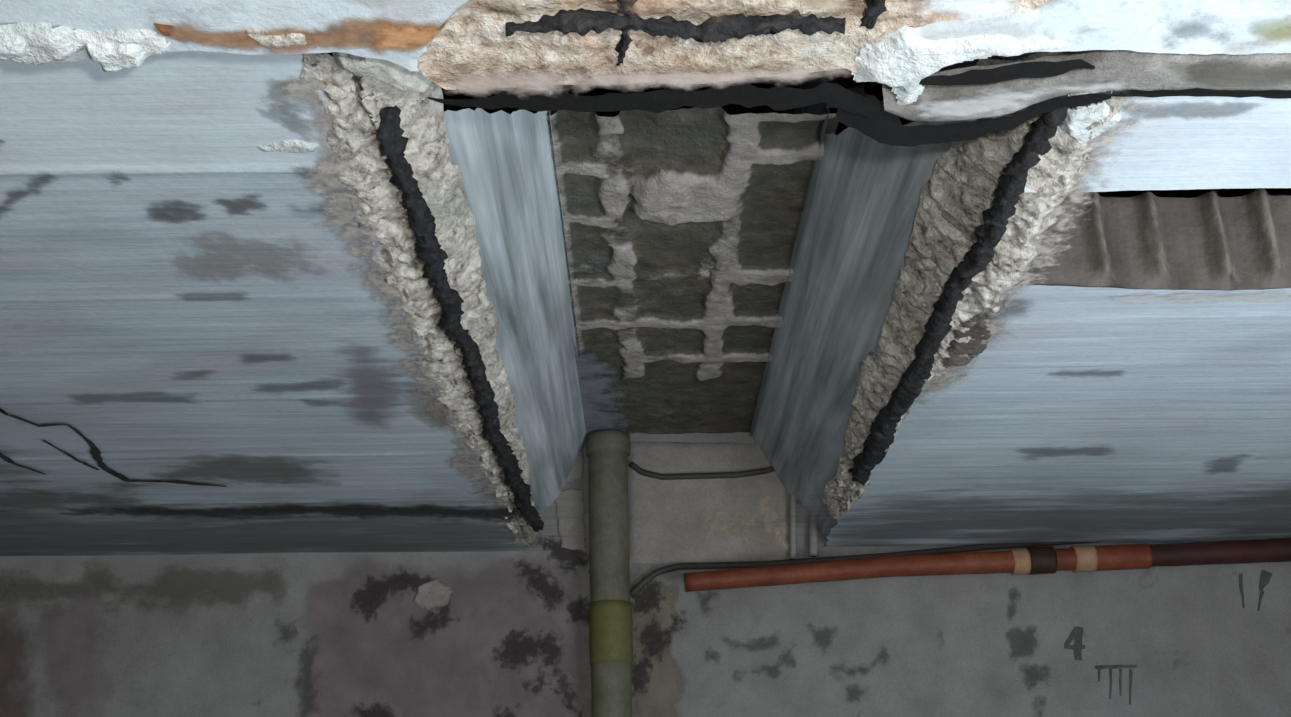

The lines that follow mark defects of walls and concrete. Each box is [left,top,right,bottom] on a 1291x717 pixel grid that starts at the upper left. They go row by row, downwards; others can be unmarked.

corrosion [154,20,446,54]
damp [0,176,53,212]
damp [150,203,202,223]
damp [218,197,263,214]
spalling [820,50,1291,519]
peeling [255,0,1051,717]
crack [0,408,227,487]
damp [70,505,522,520]